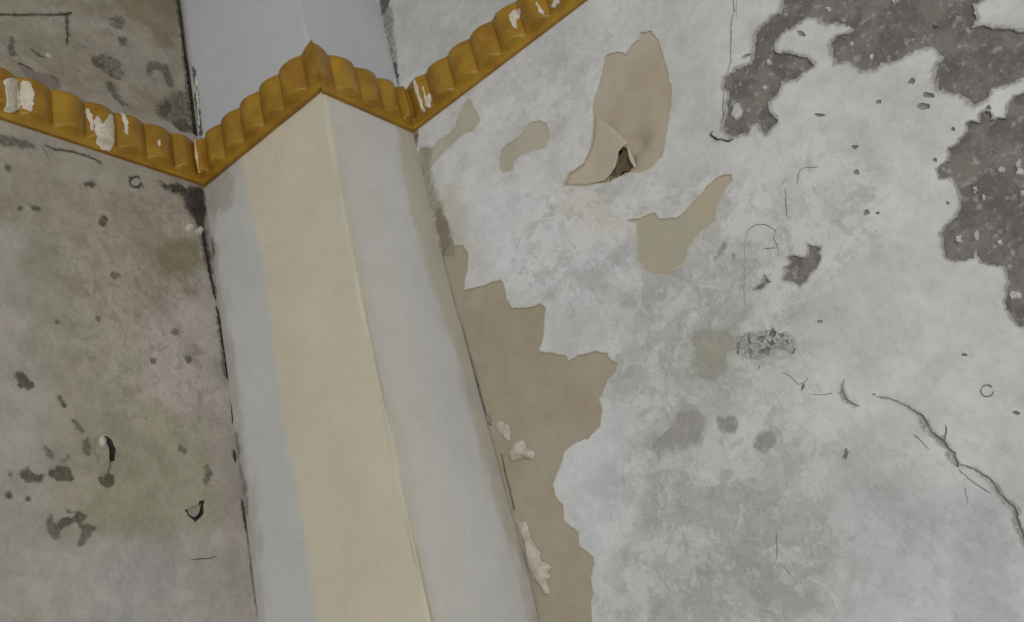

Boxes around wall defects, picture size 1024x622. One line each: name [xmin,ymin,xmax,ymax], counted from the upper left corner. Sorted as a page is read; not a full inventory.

spalling [3,78,35,113]
spalling [85,108,129,152]
spalling [413,78,432,113]
peeling [418,98,481,170]
peeling [499,120,550,172]
peeling [562,30,673,187]
flaking render [721,0,1024,328]
peeling [627,173,733,276]
flaking render [736,327,797,370]
peeling [440,236,619,622]
crack [782,372,1024,547]
peeling [185,500,204,522]